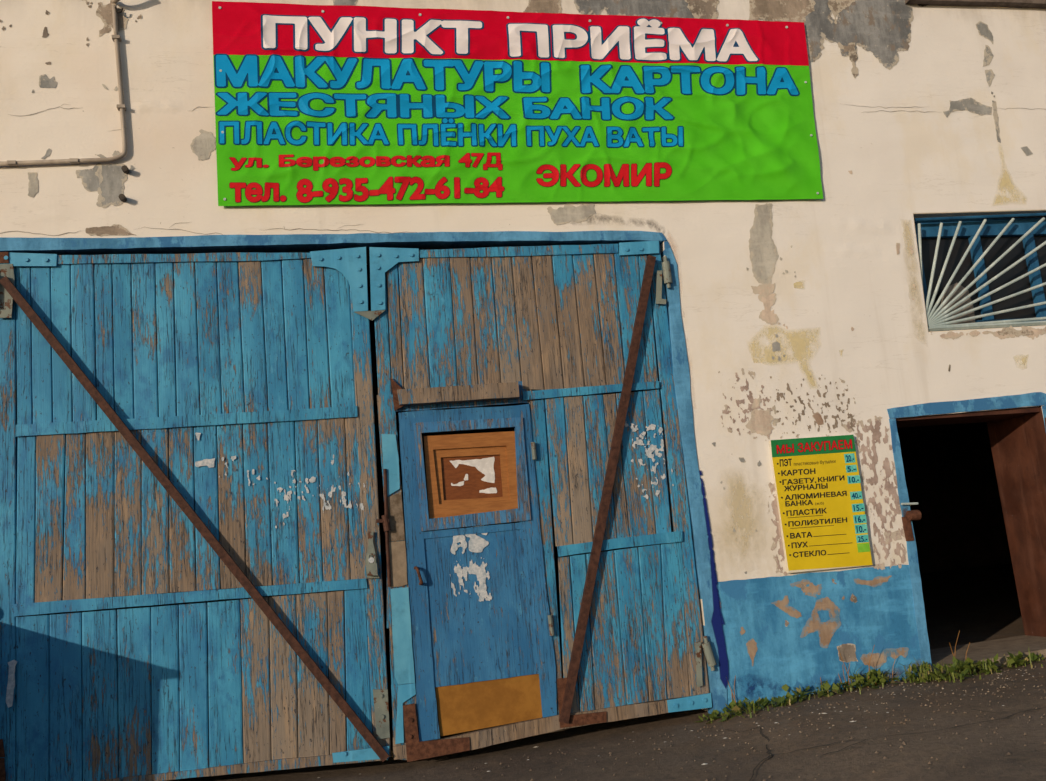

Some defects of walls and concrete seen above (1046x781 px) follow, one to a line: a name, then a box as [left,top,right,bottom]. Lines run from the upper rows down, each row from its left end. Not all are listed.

peeling [86,0,142,46]
peeling [523,0,562,13]
peeling [574,0,719,19]
peeling [749,0,914,78]
peeling [32,62,57,93]
peeling [943,21,1001,143]
peeling [190,129,216,161]
peeling [76,150,135,208]
peeling [747,203,796,361]
peeling [718,368,909,669]